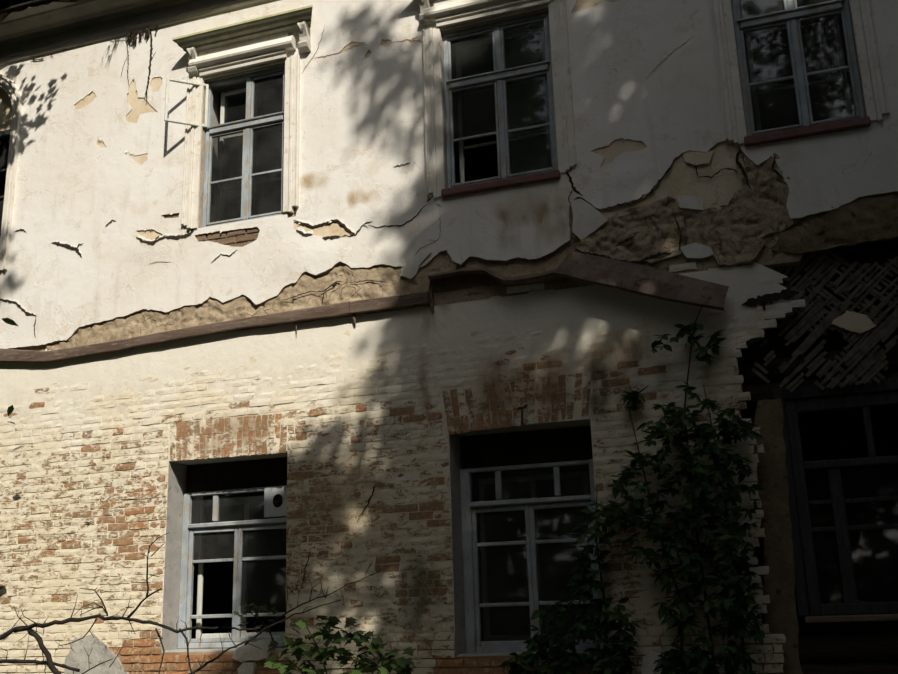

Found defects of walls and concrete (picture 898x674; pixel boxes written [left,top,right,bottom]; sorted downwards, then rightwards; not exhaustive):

crack [121,28,160,104]
spalling [126,76,163,123]
spalling [137,228,163,241]
spalling [196,216,270,247]
spalling [287,207,353,238]
spalling [575,137,898,262]
spalling [46,251,460,351]